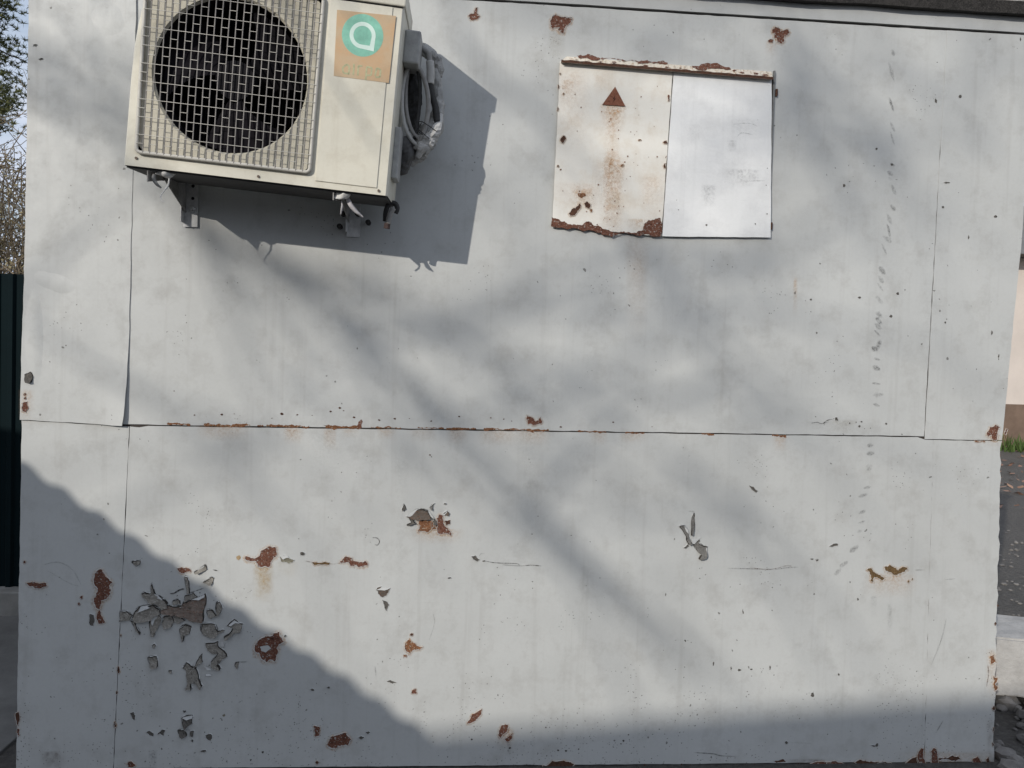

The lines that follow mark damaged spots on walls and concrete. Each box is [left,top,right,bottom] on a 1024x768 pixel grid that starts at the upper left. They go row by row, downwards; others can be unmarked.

rust [550,14,573,34]
rust [768,26,790,44]
rust [194,413,313,429]
rust [325,407,562,433]
peeling [401,502,452,536]
peeling [679,513,708,560]
rust [236,545,278,568]
rust [866,564,913,583]
rust [77,568,113,627]
peeling [119,564,243,691]
rust [254,631,287,663]
rust [313,725,352,749]